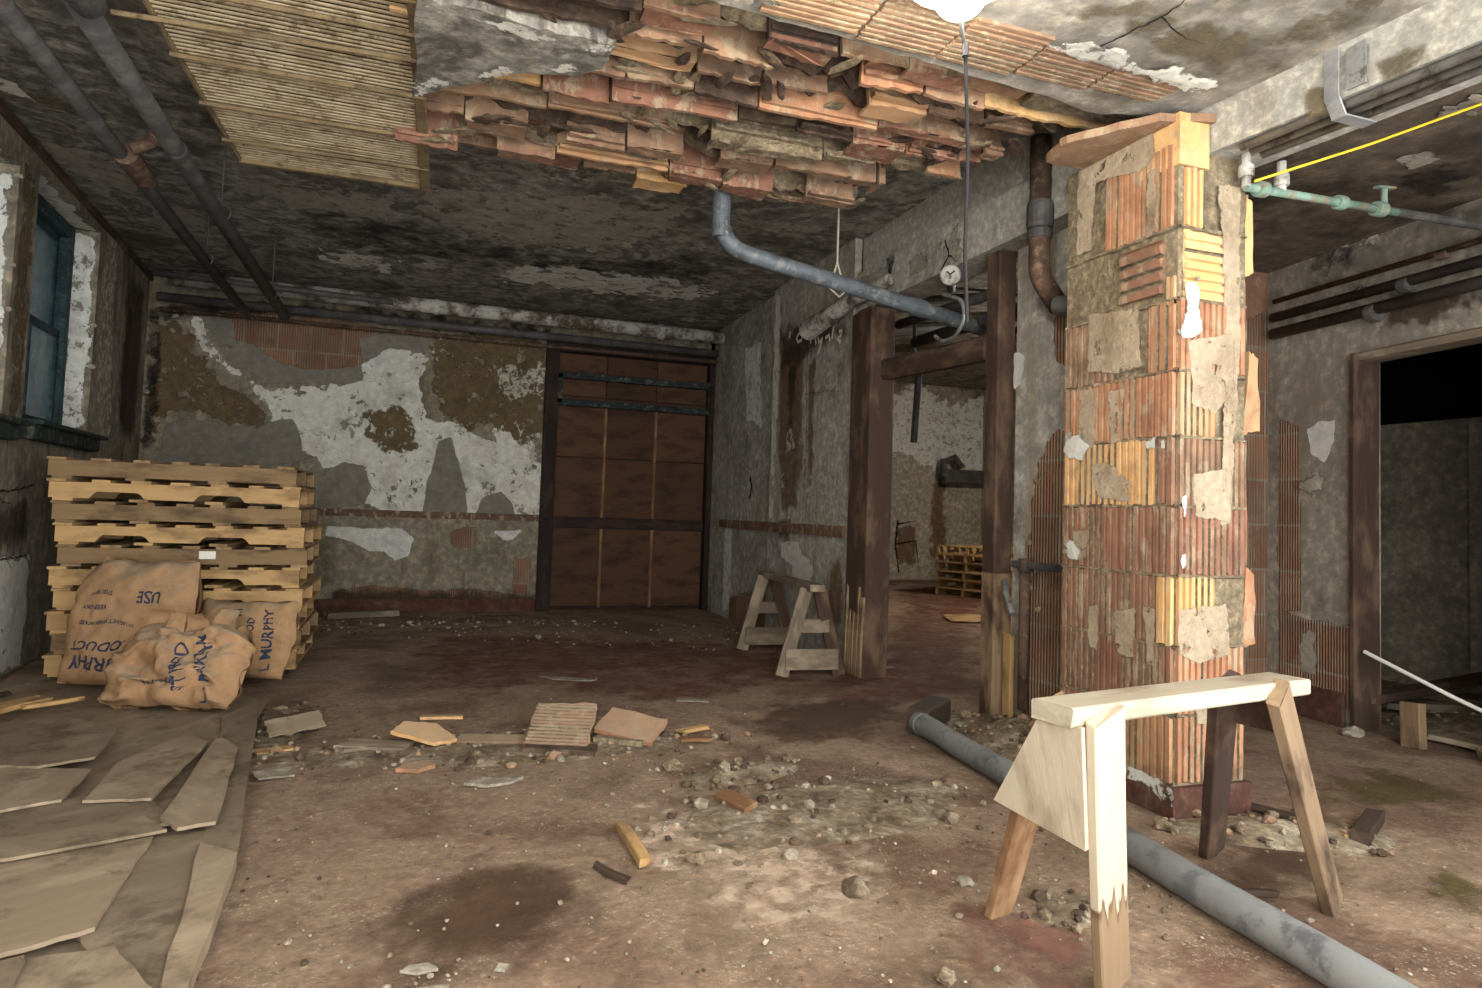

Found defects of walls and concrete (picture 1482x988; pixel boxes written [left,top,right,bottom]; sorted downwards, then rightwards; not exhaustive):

flaking render [0,78,86,124]
peeling [1048,41,1218,93]
water stain [37,140,228,243]
water stain [238,175,552,267]
flaking render [1053,315,1067,366]
peeling [143,309,546,561]
flaking render [1022,429,1084,720]